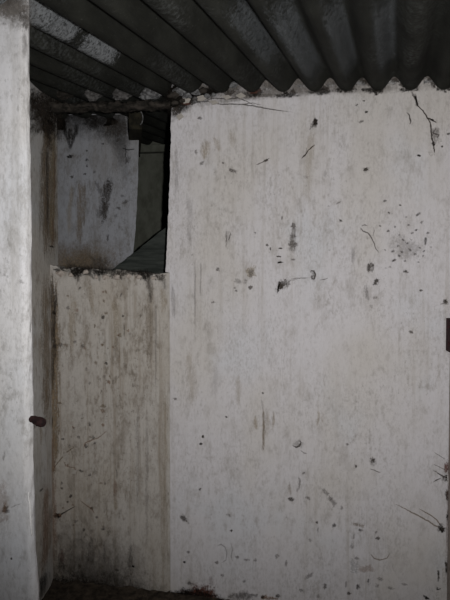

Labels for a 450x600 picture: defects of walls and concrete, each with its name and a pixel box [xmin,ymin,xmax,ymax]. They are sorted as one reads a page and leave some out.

crack [408,93,439,153]